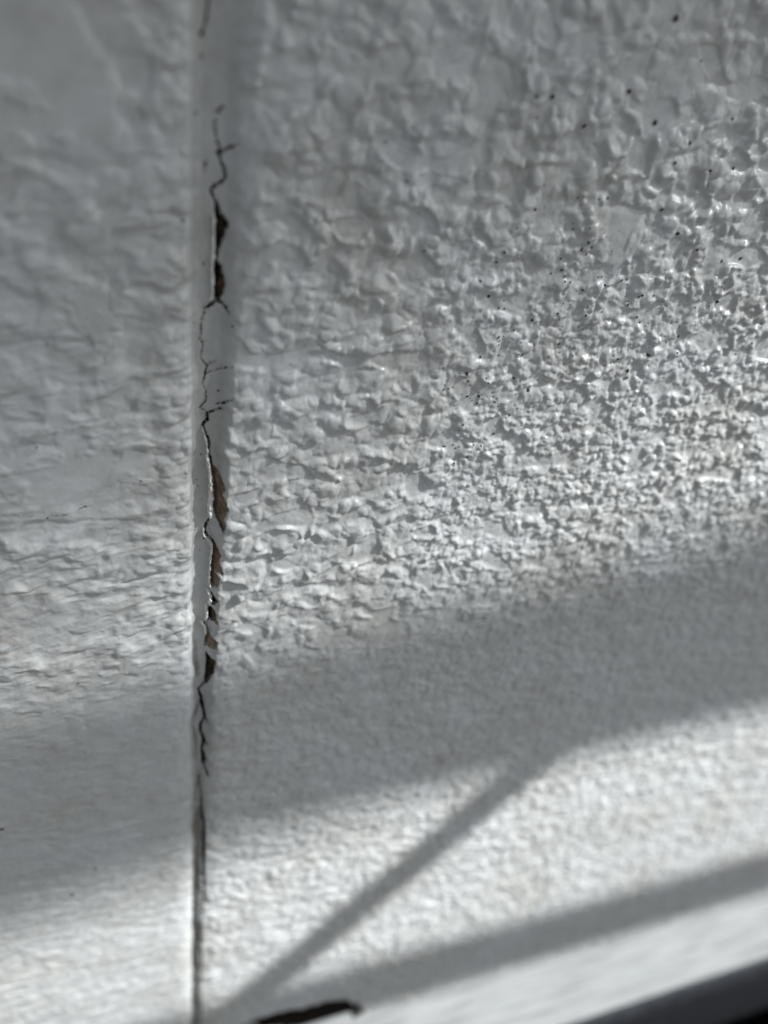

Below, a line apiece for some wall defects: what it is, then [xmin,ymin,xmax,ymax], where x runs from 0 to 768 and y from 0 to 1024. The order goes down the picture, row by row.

crack [198,105,238,467]
crack [202,519,213,544]
peeling [200,462,229,684]